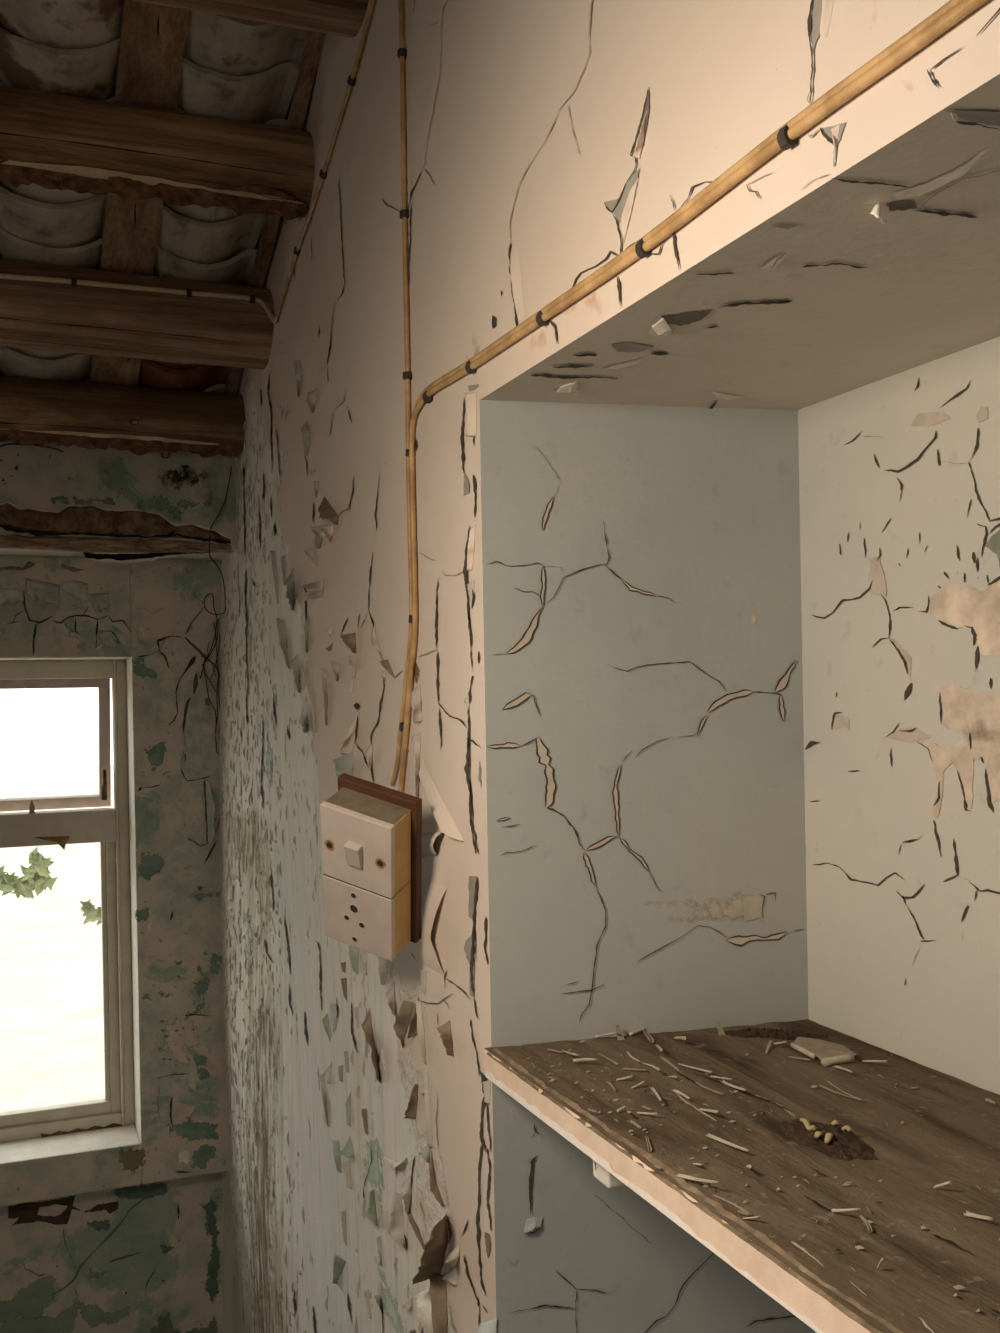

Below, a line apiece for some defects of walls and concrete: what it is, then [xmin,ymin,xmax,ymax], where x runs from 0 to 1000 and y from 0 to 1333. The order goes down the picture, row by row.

crack [807,0,833,103]
peeling [604,86,649,253]
mould [161,465,207,489]
spalling [0,361,402,803]
peeling [418,384,482,855]
crack [488,521,677,655]
crack [812,378,1000,738]
crack [487,660,804,1022]
crack [814,820,1000,986]
peeling [8,1183,180,1231]
mould [118,1147,146,1174]
peeling [317,876,497,1333]